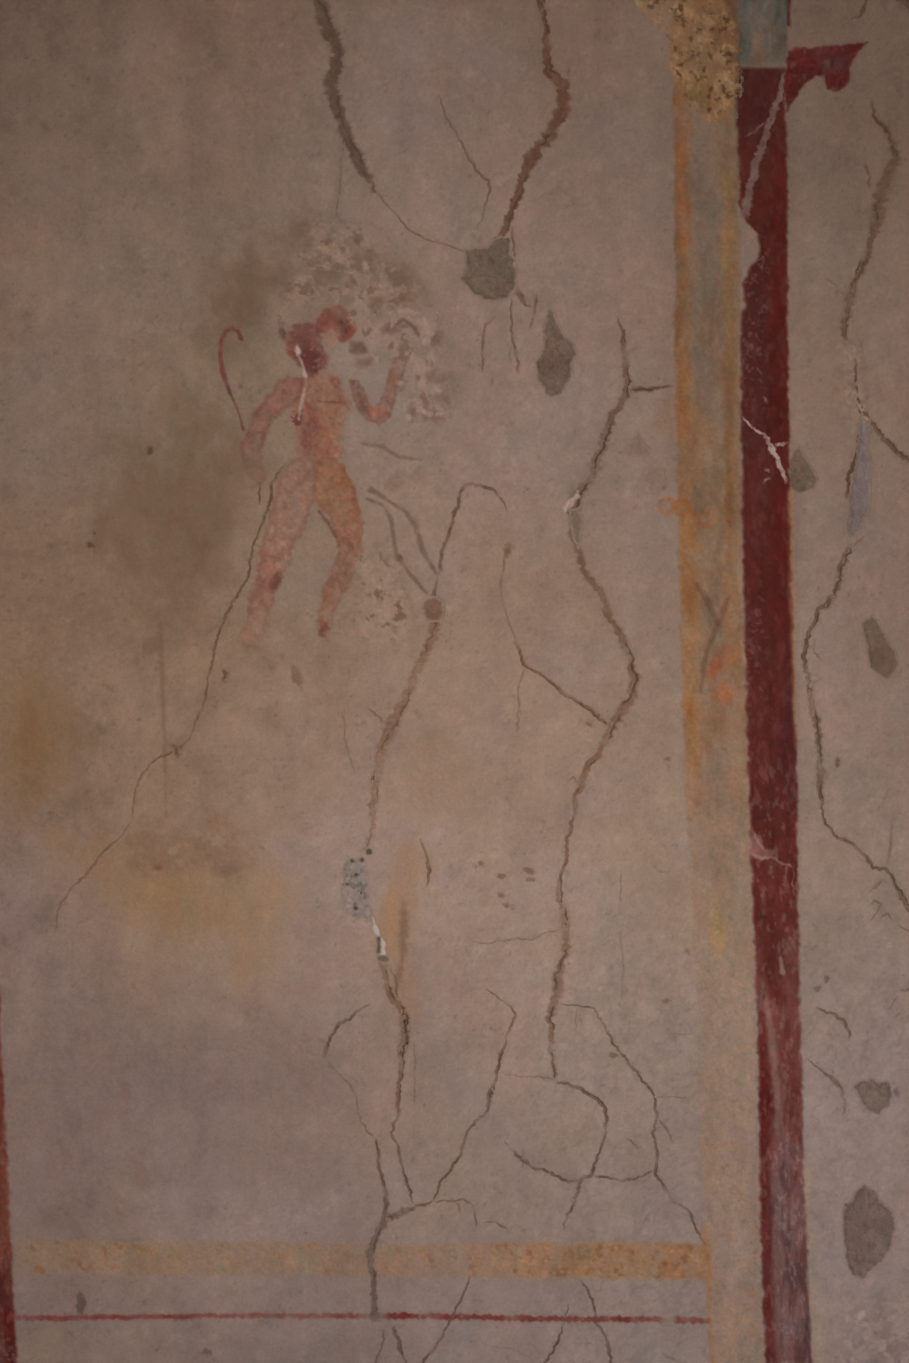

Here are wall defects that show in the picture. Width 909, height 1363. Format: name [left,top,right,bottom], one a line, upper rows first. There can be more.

peeling [271,212,460,439]
crack [311,0,573,374]
crack [825,98,909,501]
crack [846,0,909,24]
crack [54,462,287,935]
flaking render [344,847,389,964]
crack [321,316,707,1363]
crack [800,535,909,933]